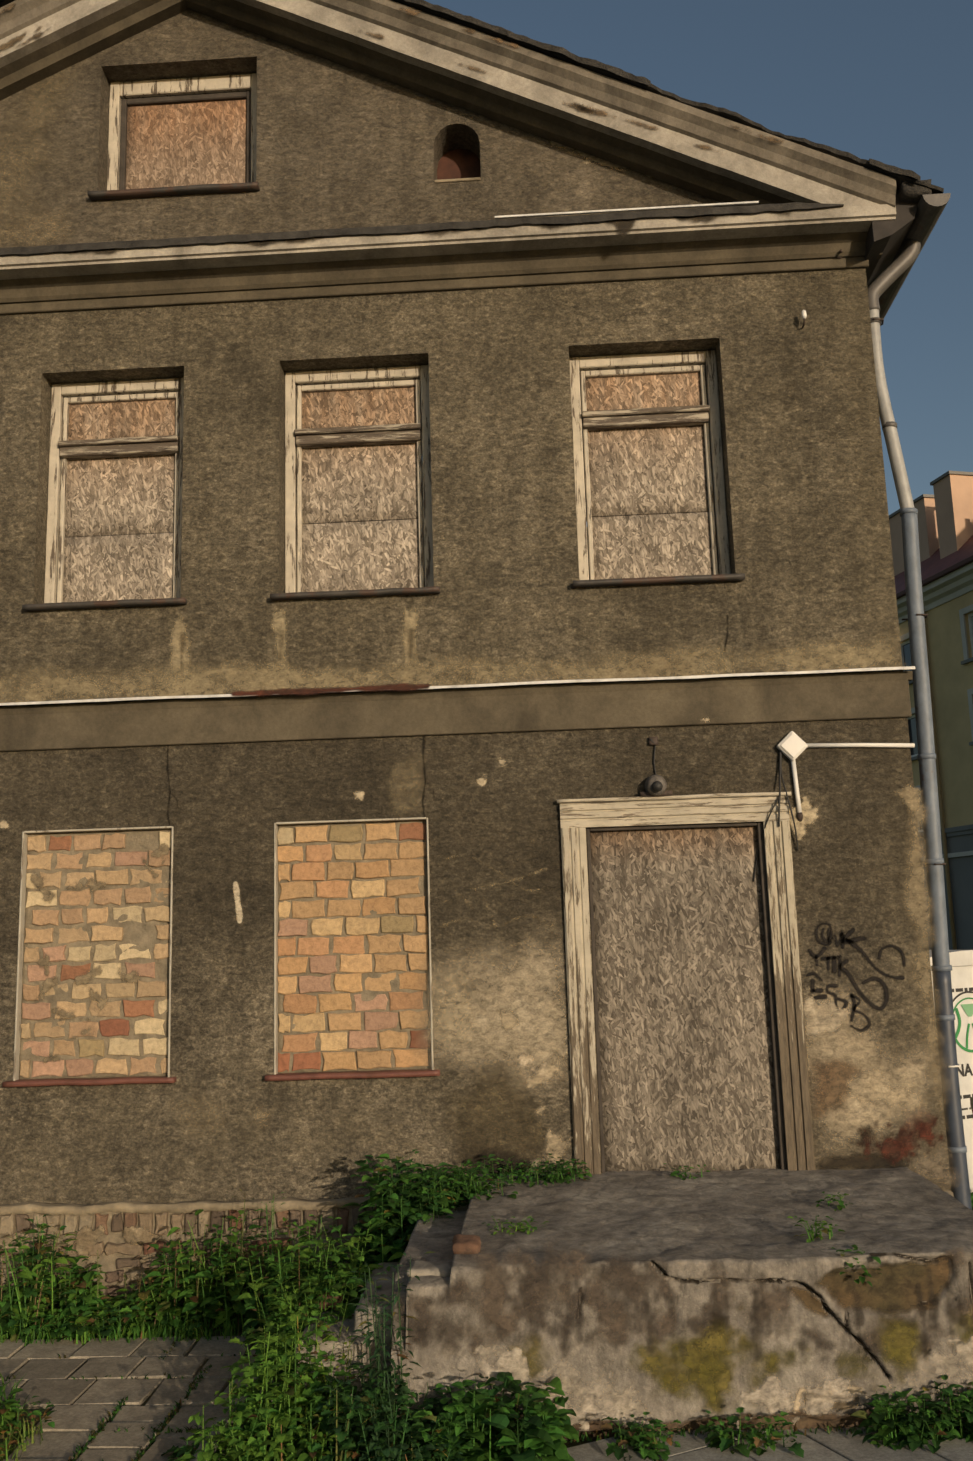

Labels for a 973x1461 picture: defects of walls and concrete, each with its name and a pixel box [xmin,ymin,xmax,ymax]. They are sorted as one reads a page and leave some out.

crack [659,1267,890,1375]